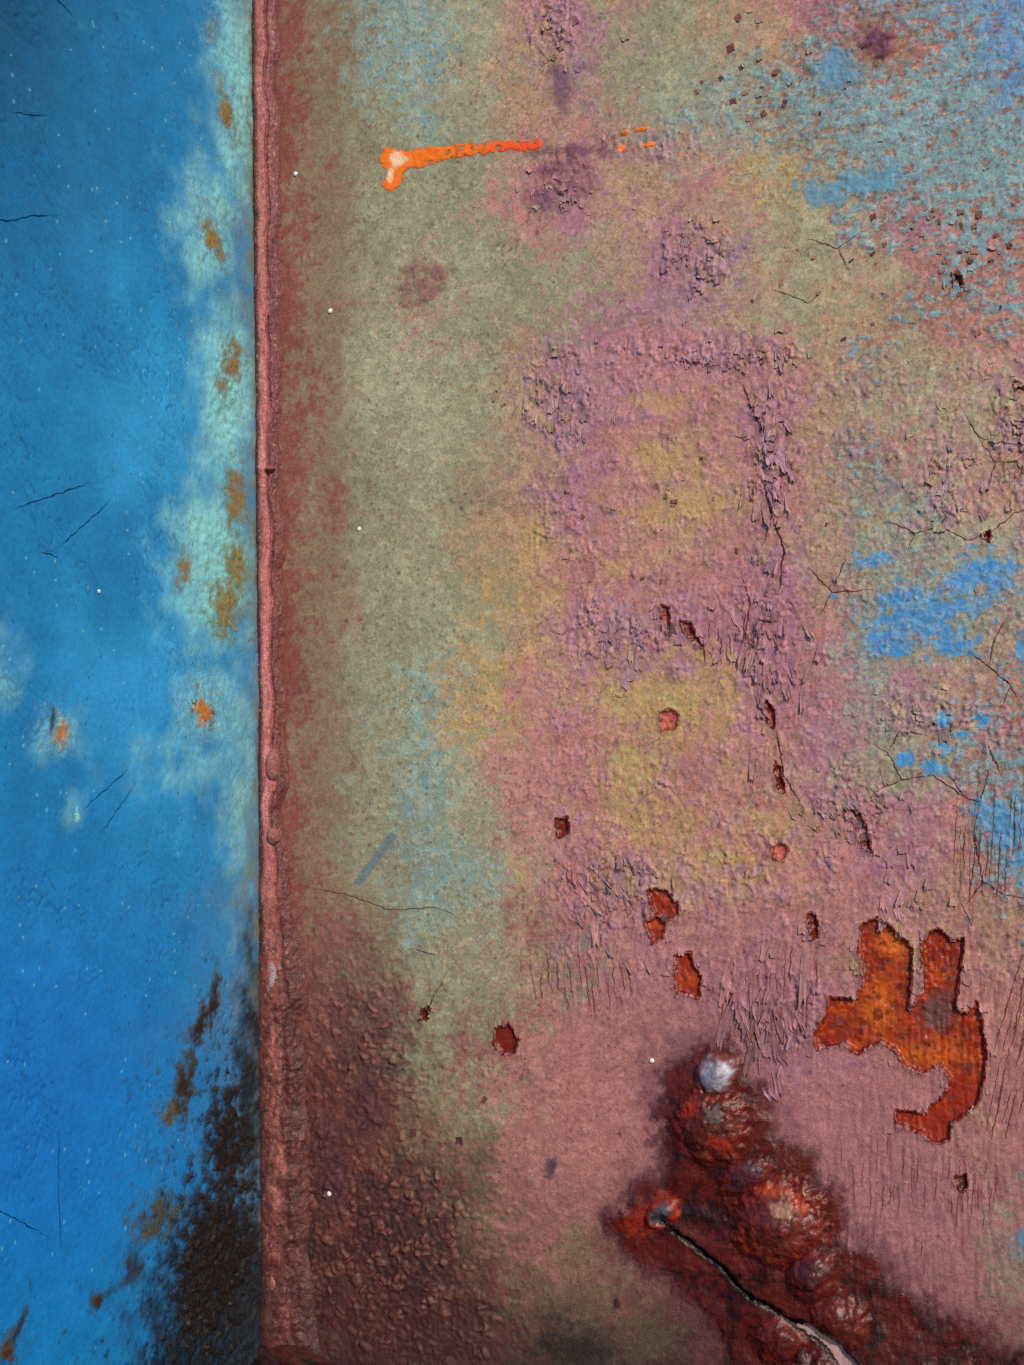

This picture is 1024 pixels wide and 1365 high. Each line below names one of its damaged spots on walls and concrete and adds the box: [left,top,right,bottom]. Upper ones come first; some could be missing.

corrosion [191,193,228,273]
peeling [659,325,813,528]
corrosion [191,446,254,642]
peeling [557,371,1024,735]
peeling [554,815,570,839]
peeling [967,780,1024,891]
peeling [564,698,998,1145]
corrosion [158,963,226,1126]
peeling [488,1020,527,1069]
corrosion [90,1189,185,1310]
crack [664,1221,858,1365]
corrosion [601,1034,1024,1365]